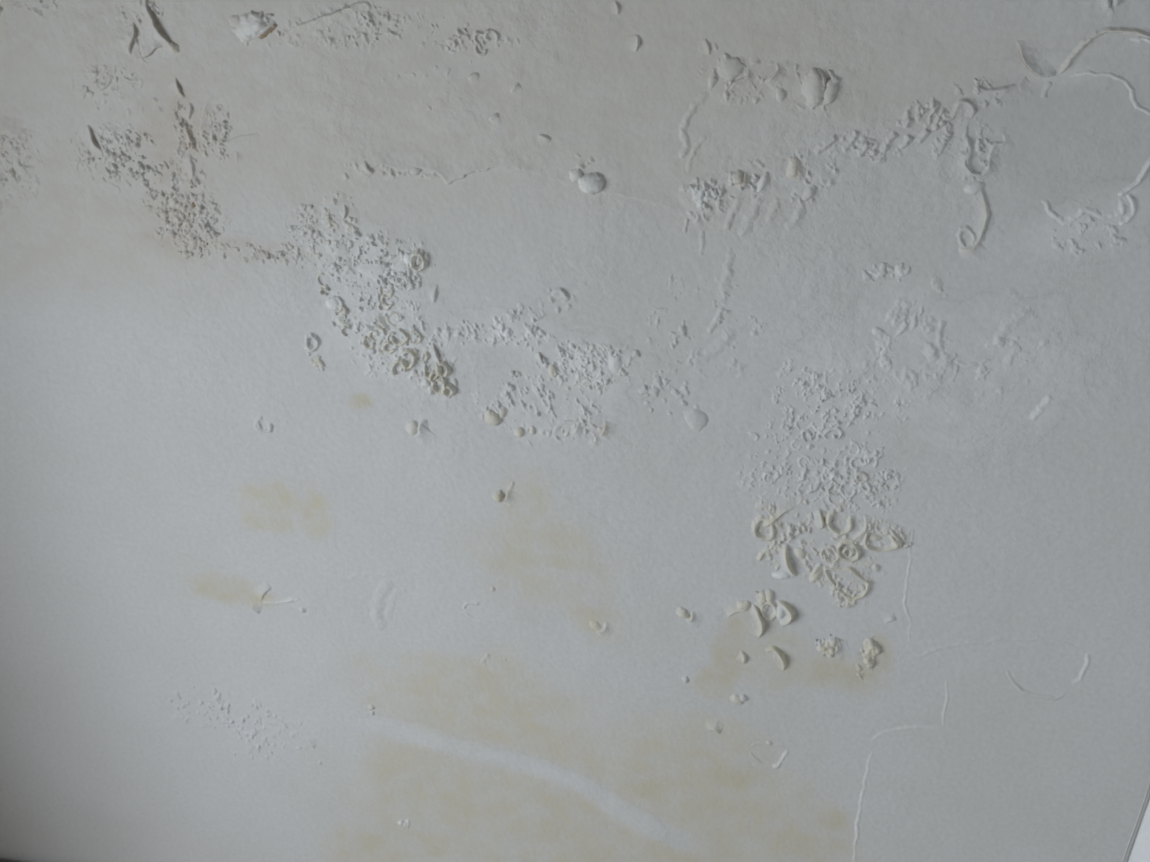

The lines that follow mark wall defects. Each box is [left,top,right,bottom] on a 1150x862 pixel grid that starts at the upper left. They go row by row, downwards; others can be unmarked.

flaking render [63,62,331,269]
leakage [227,472,335,548]
peeling [719,491,914,671]
leakage [283,610,911,862]
crack [852,679,949,862]